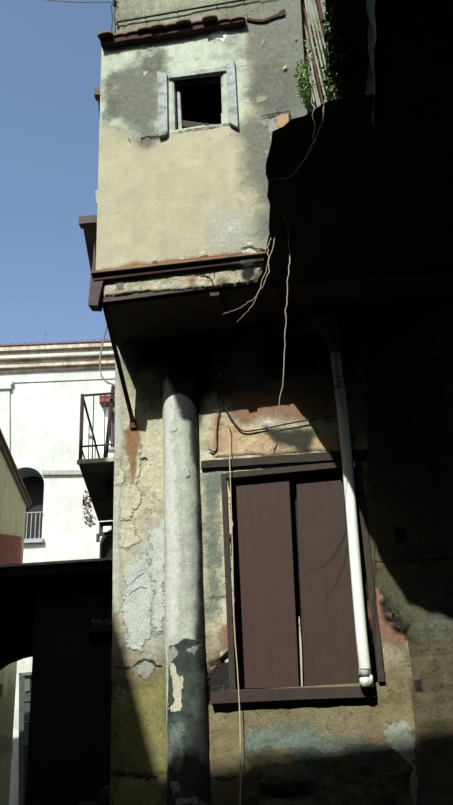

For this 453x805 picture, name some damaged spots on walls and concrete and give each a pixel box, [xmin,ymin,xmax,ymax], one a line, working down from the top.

water stain [102,0,326,249]
spalling [259,113,289,157]
corrosion [125,428,139,480]
peeling [114,441,236,805]
water stain [245,723,376,754]